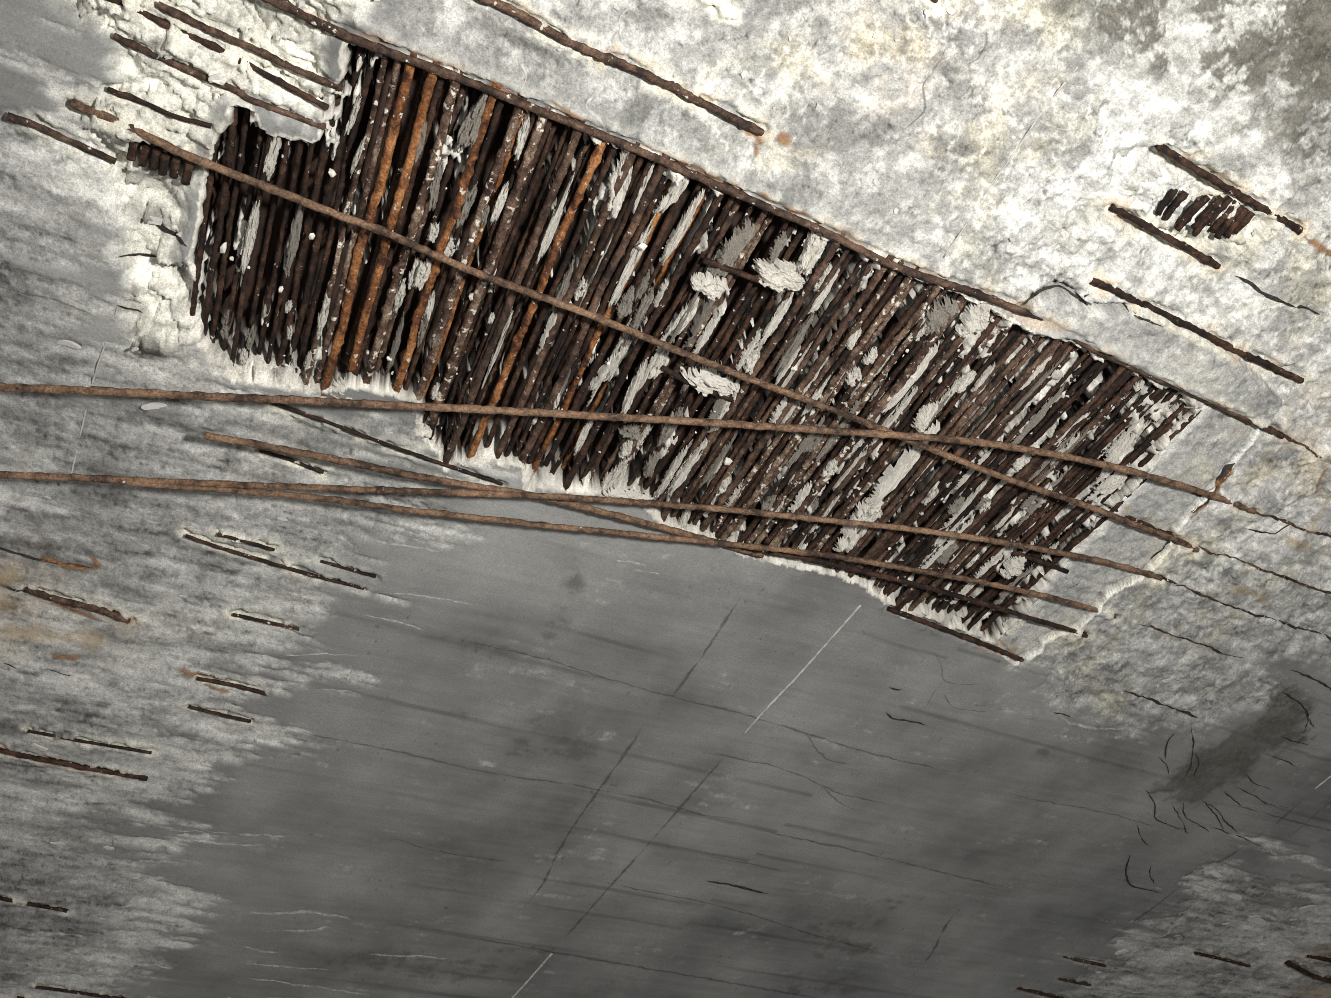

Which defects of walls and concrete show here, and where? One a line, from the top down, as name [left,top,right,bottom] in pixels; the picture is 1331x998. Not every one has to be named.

spalling [0,0,538,403]
corrosion [0,0,1304,662]
peeling [289,0,1331,745]
crack [1024,285,1163,327]
crack [1236,276,1320,315]
corrosion [0,747,148,781]
corrosion [28,729,152,754]
peeling [0,391,767,998]
crack [1046,670,1331,893]
damp [1148,681,1323,813]
corrosion [1194,951,1251,968]
corrosion [1285,955,1331,984]